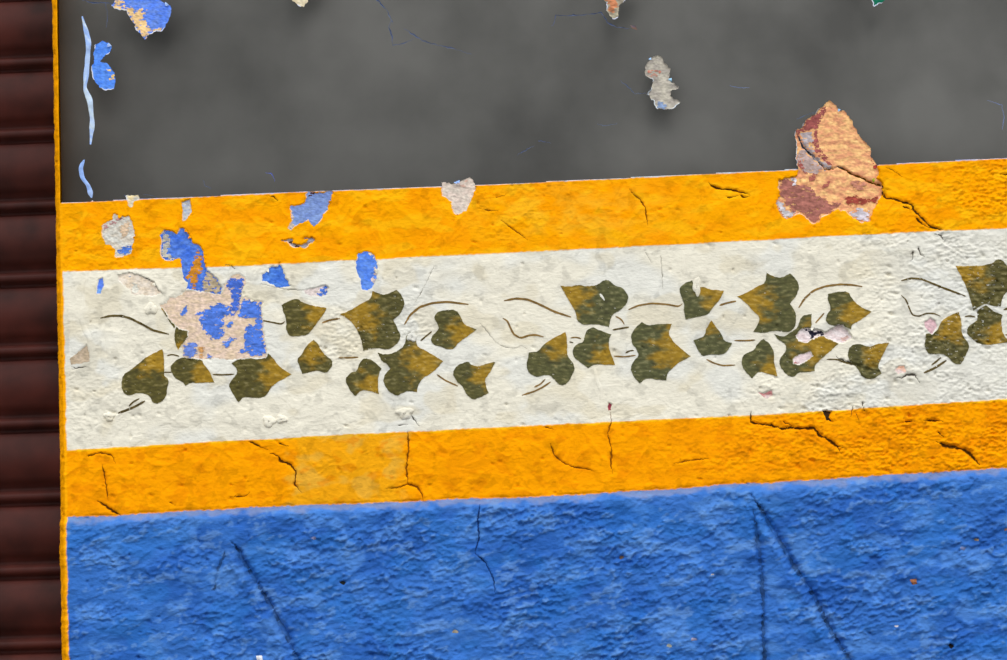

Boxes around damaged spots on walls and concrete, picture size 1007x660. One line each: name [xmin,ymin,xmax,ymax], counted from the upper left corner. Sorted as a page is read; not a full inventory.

peeling [111,0,171,39]
peeling [604,0,625,19]
peeling [91,41,116,90]
flaking render [645,55,680,110]
peeling [776,100,885,224]
peeling [101,195,140,258]
peeling [282,191,333,248]
peeling [441,177,476,215]
peeling [118,200,267,360]
peeling [355,251,378,291]